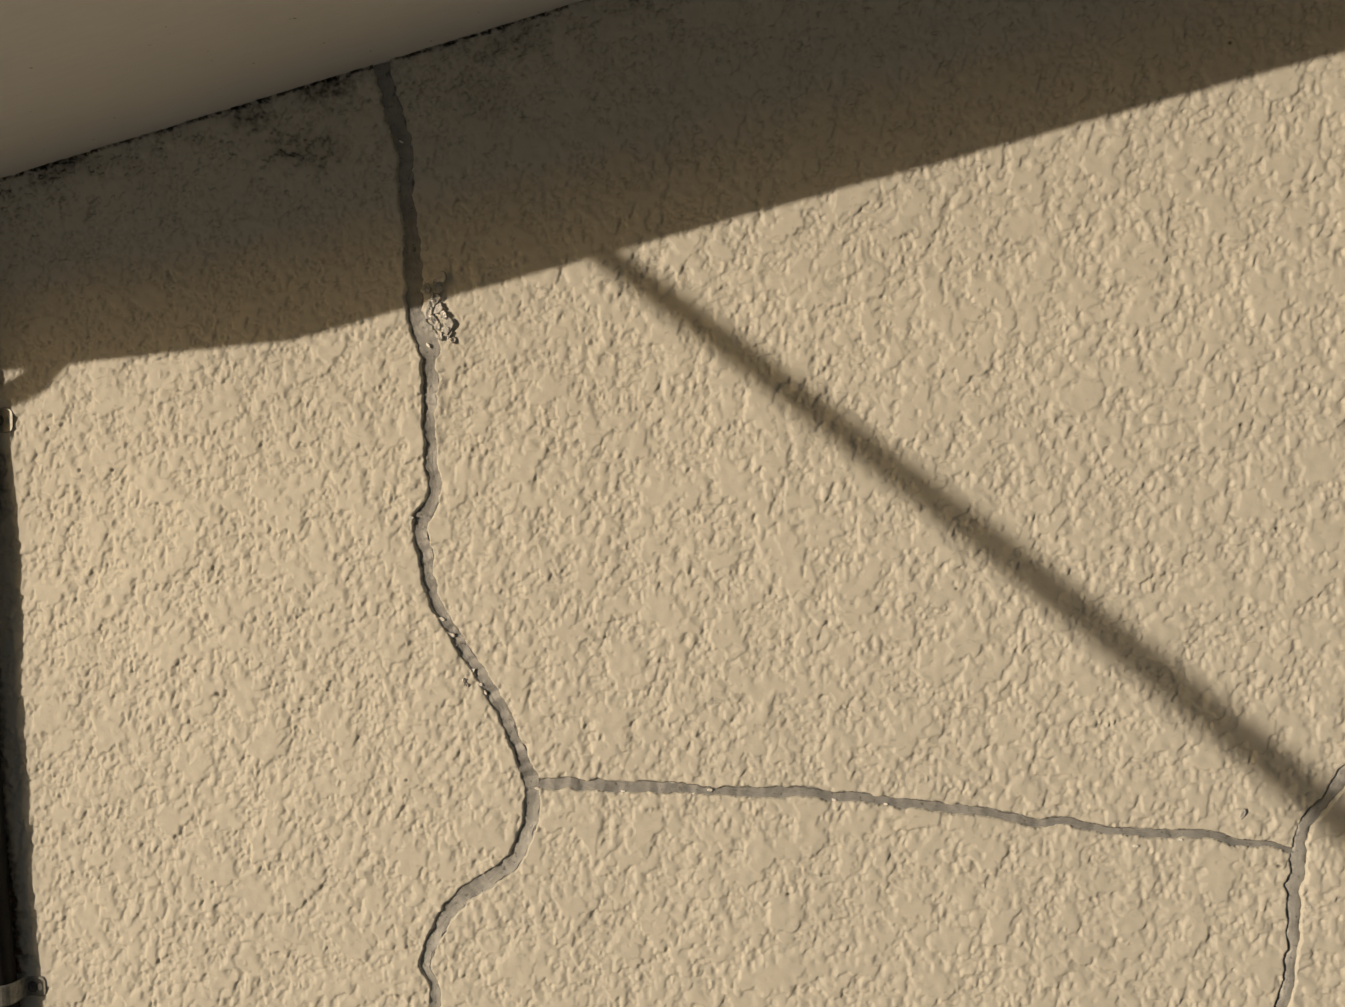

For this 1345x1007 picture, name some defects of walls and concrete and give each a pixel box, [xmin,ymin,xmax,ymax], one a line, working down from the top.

crack [374,62,1345,1007]